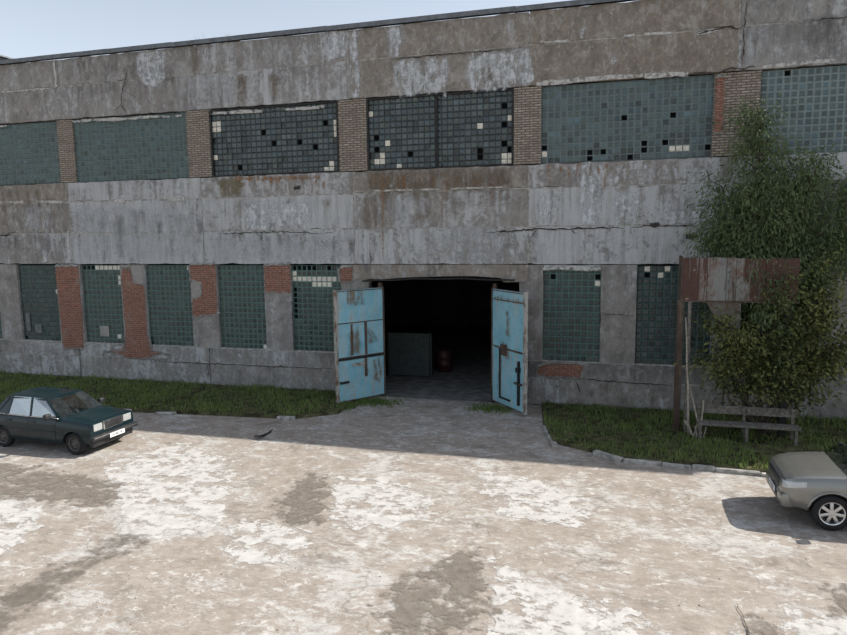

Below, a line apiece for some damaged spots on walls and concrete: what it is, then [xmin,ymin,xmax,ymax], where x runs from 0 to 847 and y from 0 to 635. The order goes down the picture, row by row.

damp [137,50,166,87]
damp [387,27,449,97]
damp [467,49,534,92]
flaking render [101,264,172,361]
flaking render [188,261,220,319]
flaking render [535,360,586,380]